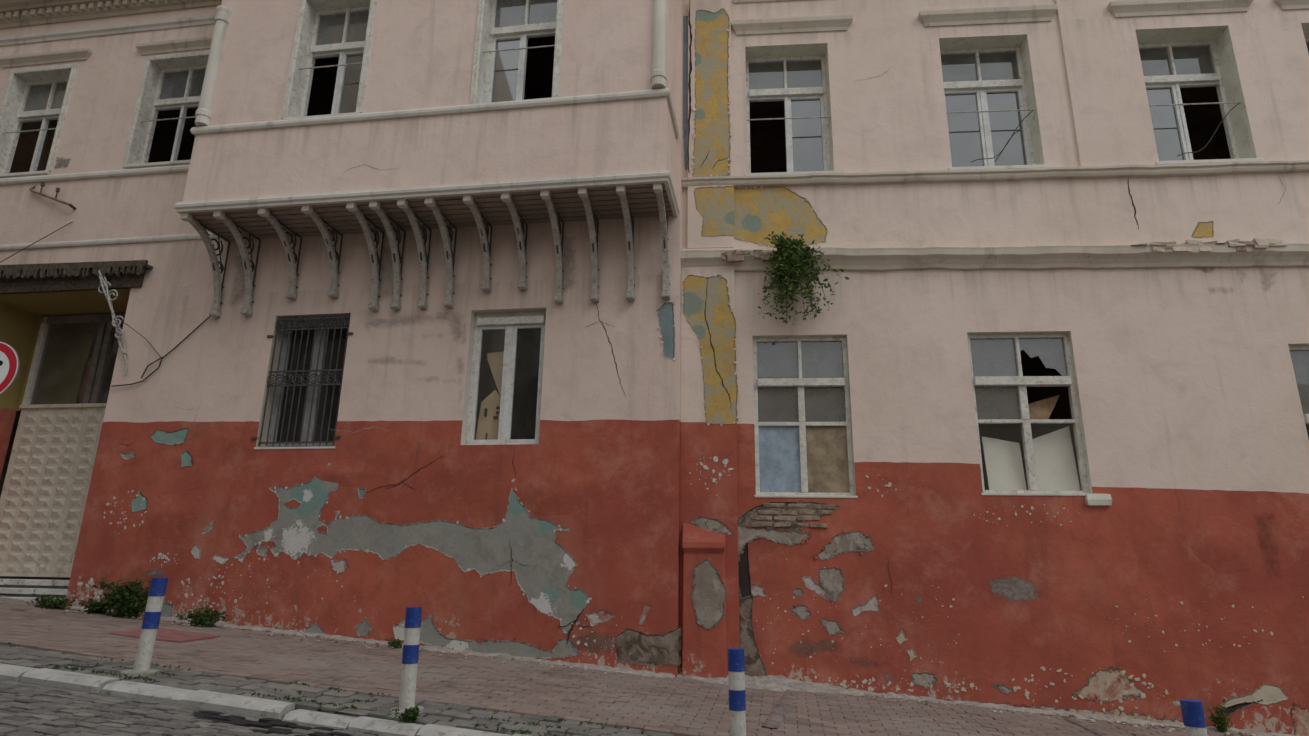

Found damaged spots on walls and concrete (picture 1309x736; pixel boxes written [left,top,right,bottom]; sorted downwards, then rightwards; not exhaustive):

peeling [655,8,829,426]
crack [586,302,626,396]
peeling [151,428,193,468]
peeling [689,456,734,496]
peeling [148,463,681,666]
flaking render [690,500,876,677]
peeling [990,577,1038,601]
flaking render [1220,683,1309,736]